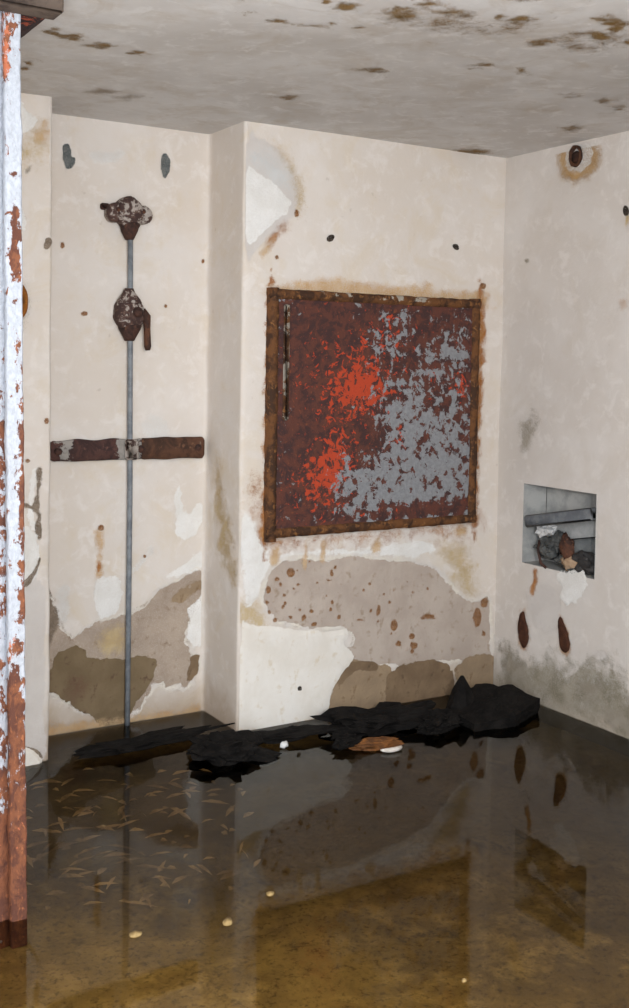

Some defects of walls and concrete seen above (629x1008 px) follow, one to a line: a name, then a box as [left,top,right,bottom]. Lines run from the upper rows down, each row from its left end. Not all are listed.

water stain [42,28,152,56]
water stain [265,0,358,28]
water stain [372,0,629,55]
water stain [22,116,50,177]
corrosion [557,143,602,189]
peeling [245,131,308,262]
corrosion [210,209,497,627]
peeling [24,526,40,584]
spalling [49,551,202,718]
spalling [241,514,494,669]
corrosion [390,619,418,654]
corrosion [472,598,488,636]